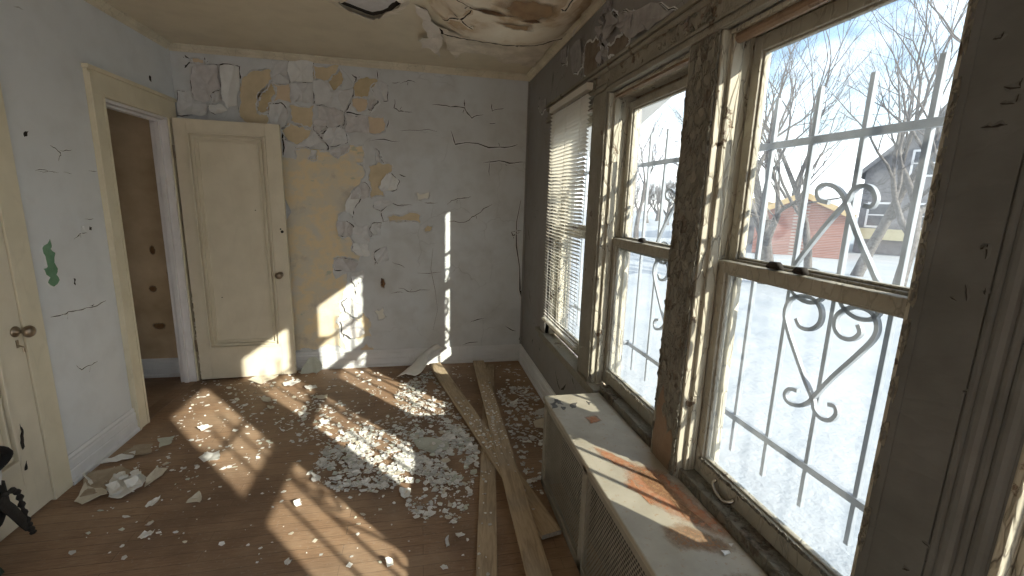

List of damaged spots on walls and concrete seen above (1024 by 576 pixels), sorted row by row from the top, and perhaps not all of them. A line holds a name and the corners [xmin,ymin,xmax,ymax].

peeling [415,5,443,58]
leakage [470,0,554,31]
peeling [560,2,689,77]
peeling [41,238,61,288]
crack [51,300,106,320]
peeling [176,56,434,386]
crack [352,196,492,329]
crack [510,200,522,302]
peeling [603,39,719,470]
corrosion [597,449,728,551]